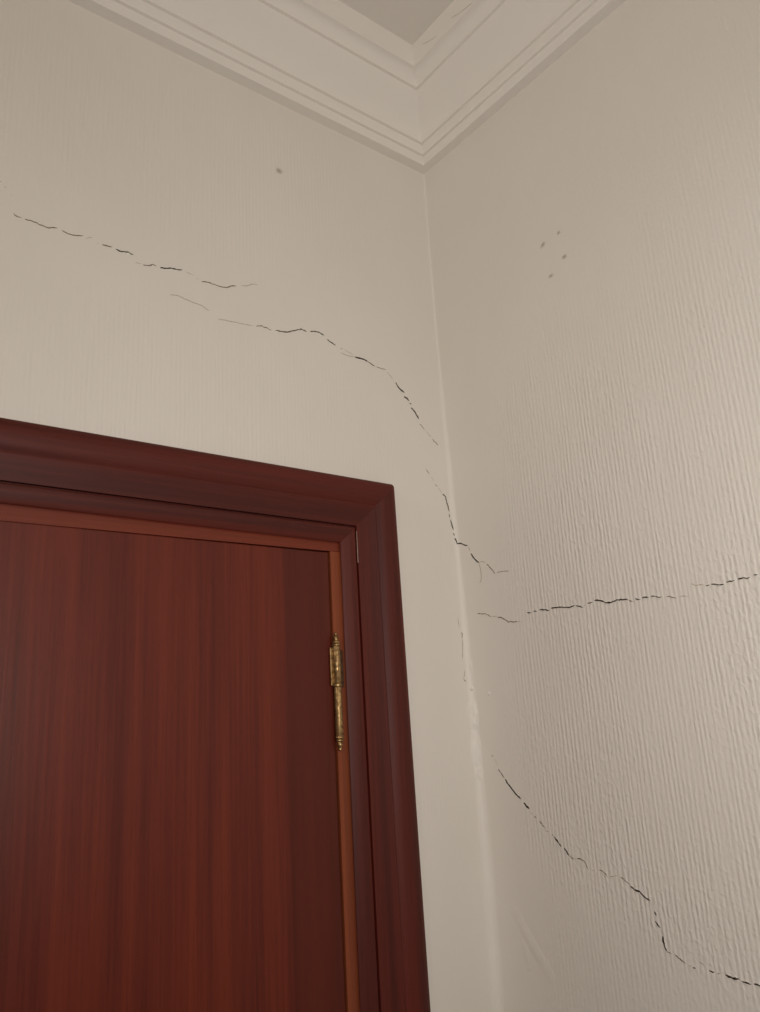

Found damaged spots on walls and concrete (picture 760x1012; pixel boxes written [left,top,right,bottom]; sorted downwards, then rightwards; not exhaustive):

crack [0,180,439,446]
crack [425,469,507,582]
crack [457,573,759,682]
crack [491,754,760,988]